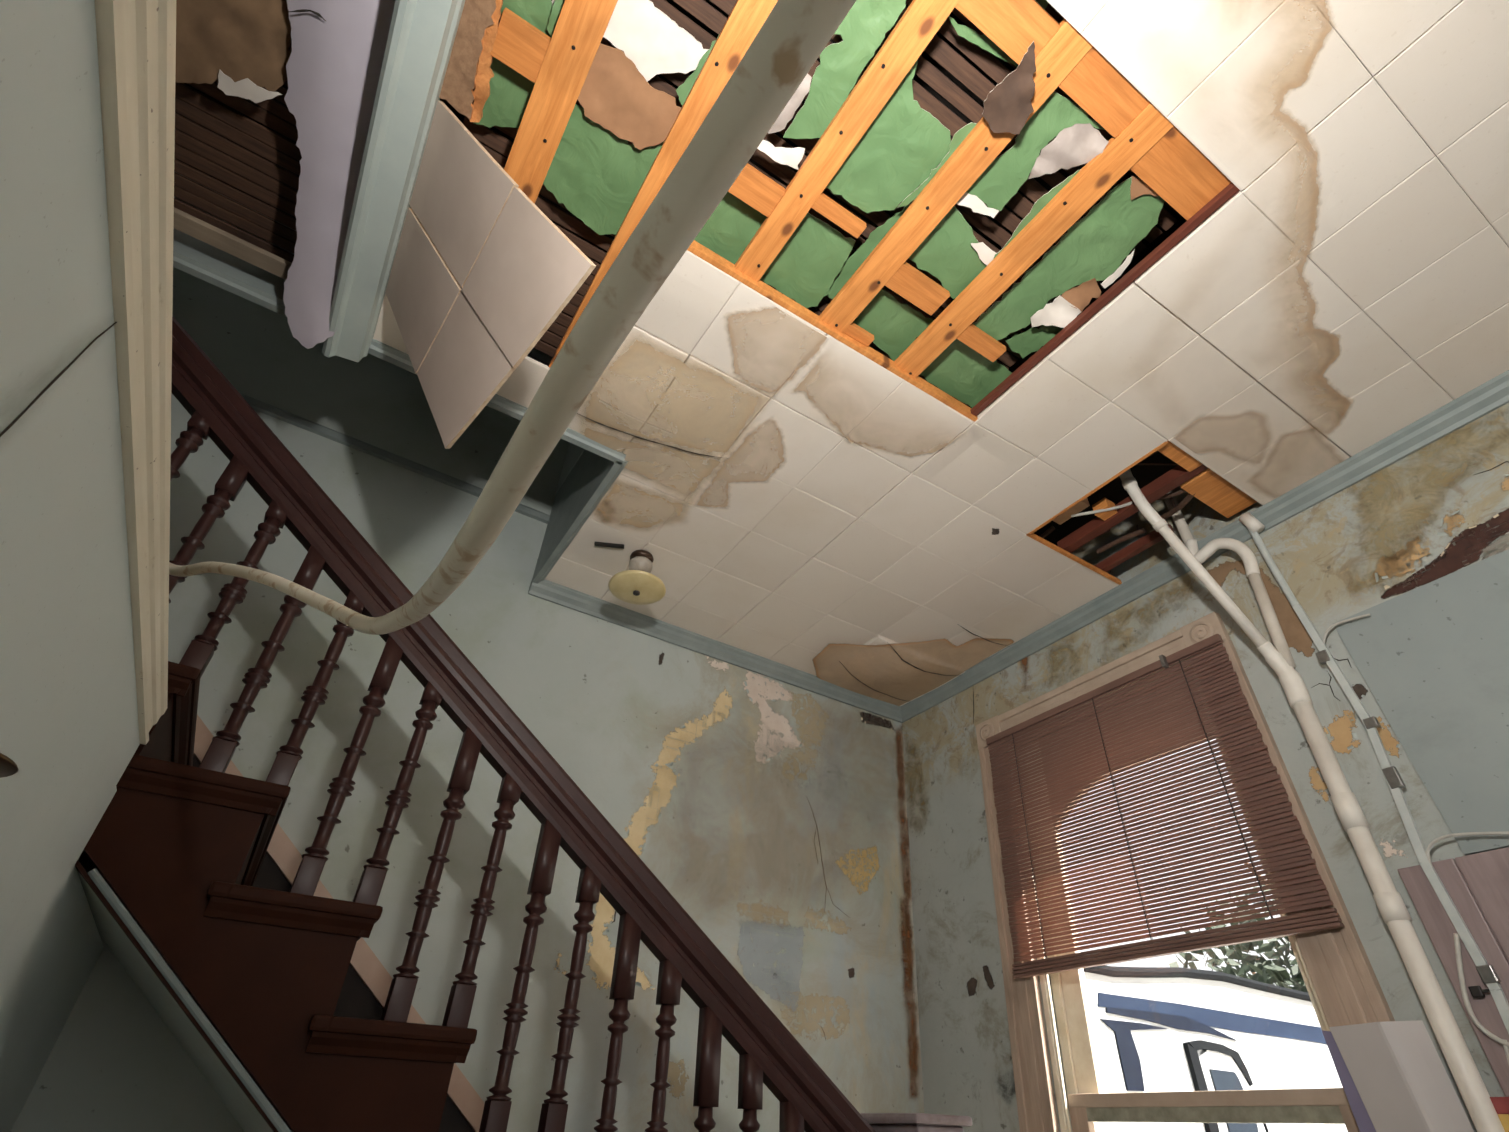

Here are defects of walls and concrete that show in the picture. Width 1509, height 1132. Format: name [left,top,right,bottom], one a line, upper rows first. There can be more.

damp [1273,0,1349,416]
crack [0,322,117,437]
spalling [1372,508,1509,599]
peeling [624,655,804,855]
peeling [1309,766,1329,802]
peeling [1322,684,1368,754]
peeling [1376,716,1401,758]
peeling [586,893,617,990]
peeling [635,967,656,990]